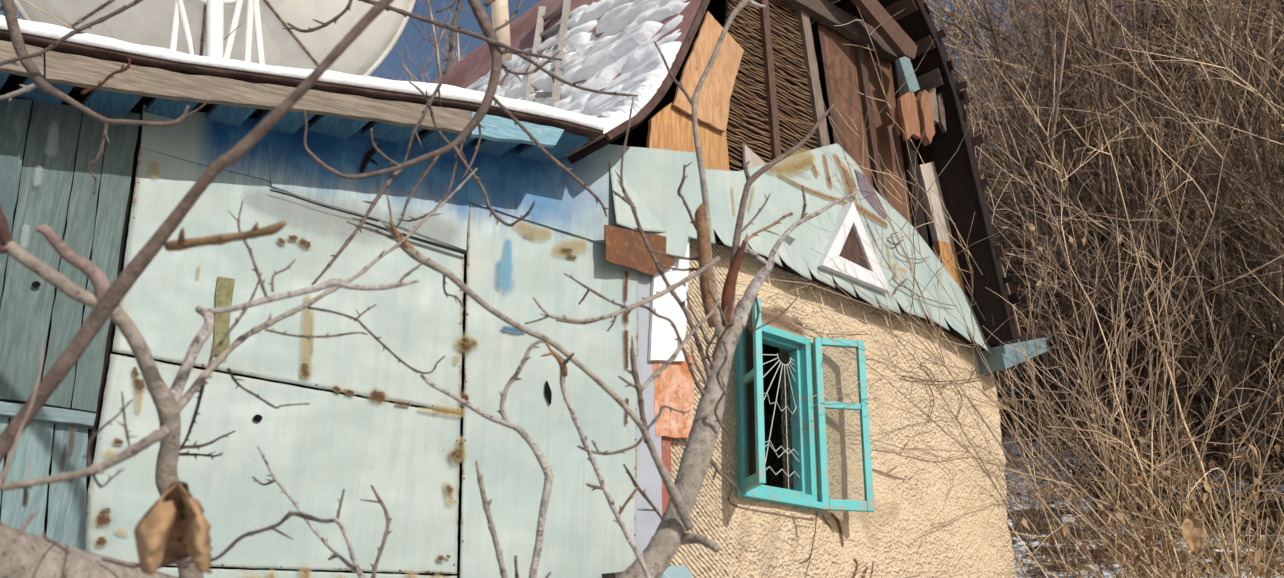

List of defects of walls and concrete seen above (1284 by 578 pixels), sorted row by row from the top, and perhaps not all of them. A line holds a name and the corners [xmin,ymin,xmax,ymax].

corrosion [278,235,311,249]
corrosion [334,385,410,406]
corrosion [96,508,111,546]